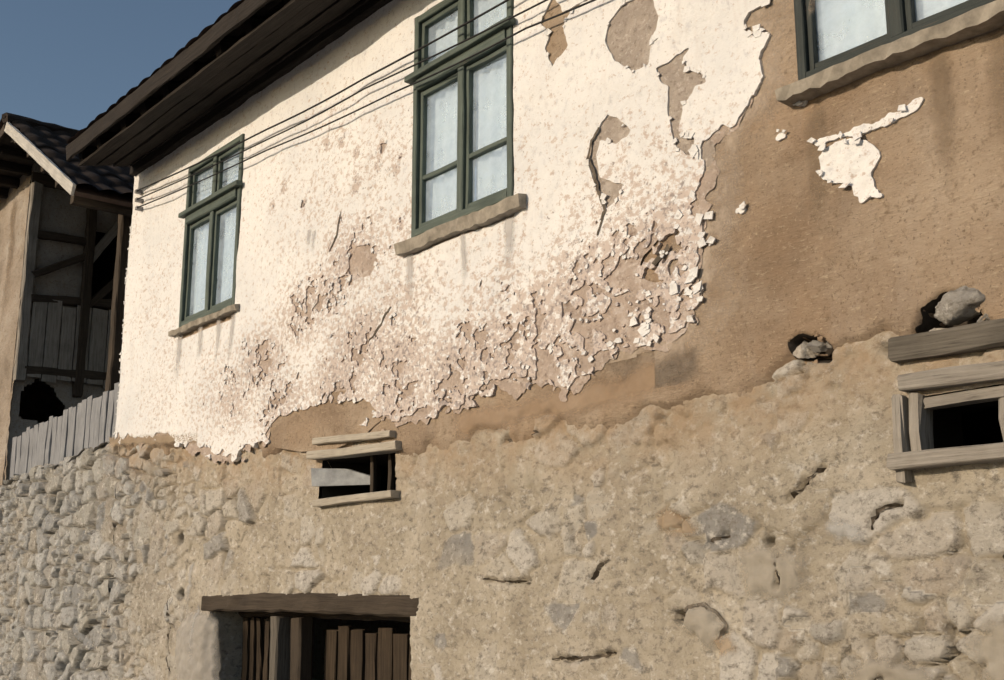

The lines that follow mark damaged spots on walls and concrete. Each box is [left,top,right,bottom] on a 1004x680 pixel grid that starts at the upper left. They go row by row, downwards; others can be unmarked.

flaking render [743,0,787,55]
crack [586,127,606,235]
peeling [186,0,775,465]
spalling [915,286,991,333]
spalling [788,333,834,363]
crack [791,468,826,499]
crack [871,503,904,530]
crack [483,577,527,585]
crack [591,559,609,580]
crack [552,651,617,661]